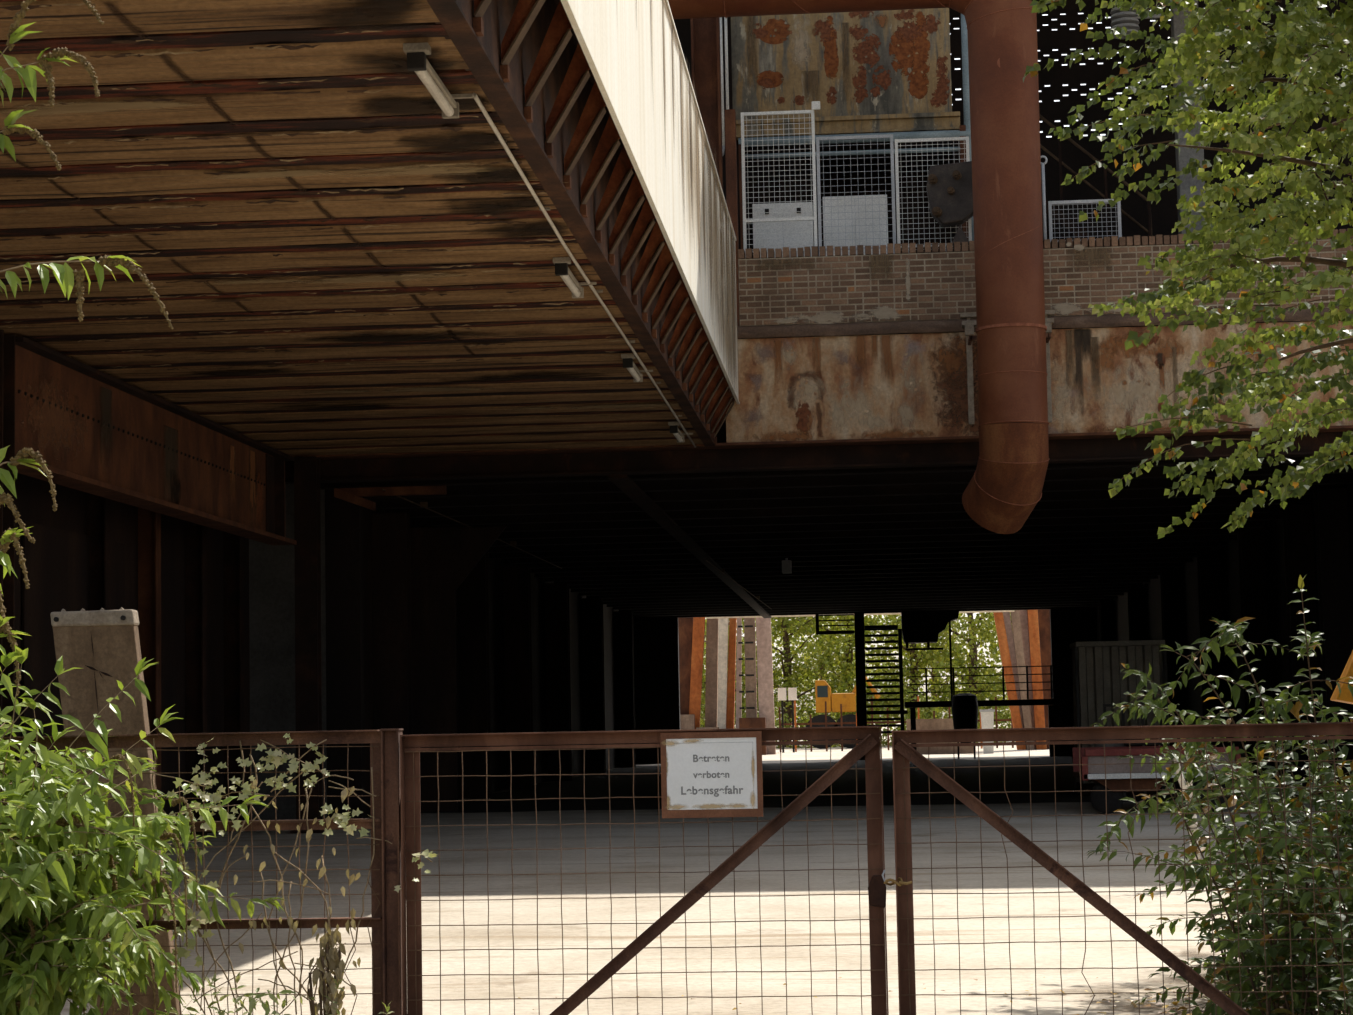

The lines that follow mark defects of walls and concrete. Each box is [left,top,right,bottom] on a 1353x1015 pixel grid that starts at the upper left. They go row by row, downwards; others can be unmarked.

corrosion [752,18,792,44]
corrosion [812,9,950,108]
damp [364,93,491,117]
corrosion [757,70,805,105]
damp [0,98,531,356]
damp [448,198,566,239]
damp [284,372,604,410]
corrosion [857,335,979,439]